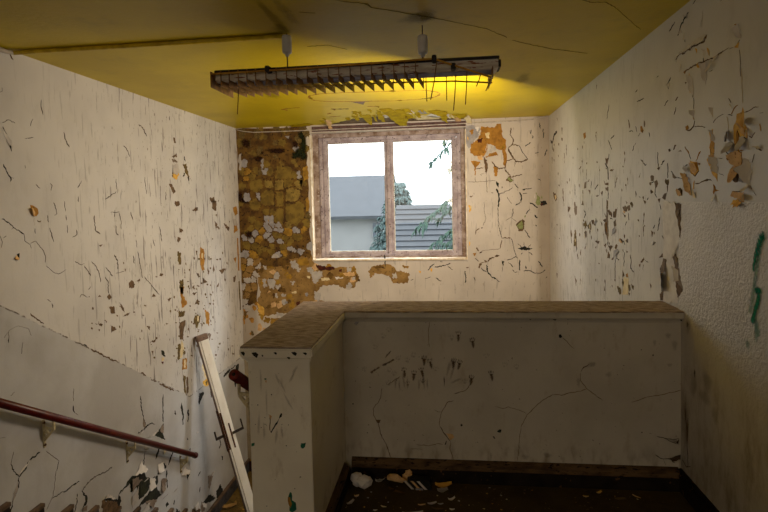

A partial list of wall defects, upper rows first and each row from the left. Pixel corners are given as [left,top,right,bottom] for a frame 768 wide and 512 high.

crack [338,0,582,53]
crack [0,183,162,297]
crack [412,128,547,283]
peeling [516,98,762,304]
crack [4,299,53,354]
peeling [89,294,146,333]
crack [2,437,112,512]
peeling [101,396,180,512]
peeling [192,471,244,512]
peeling [288,488,296,512]